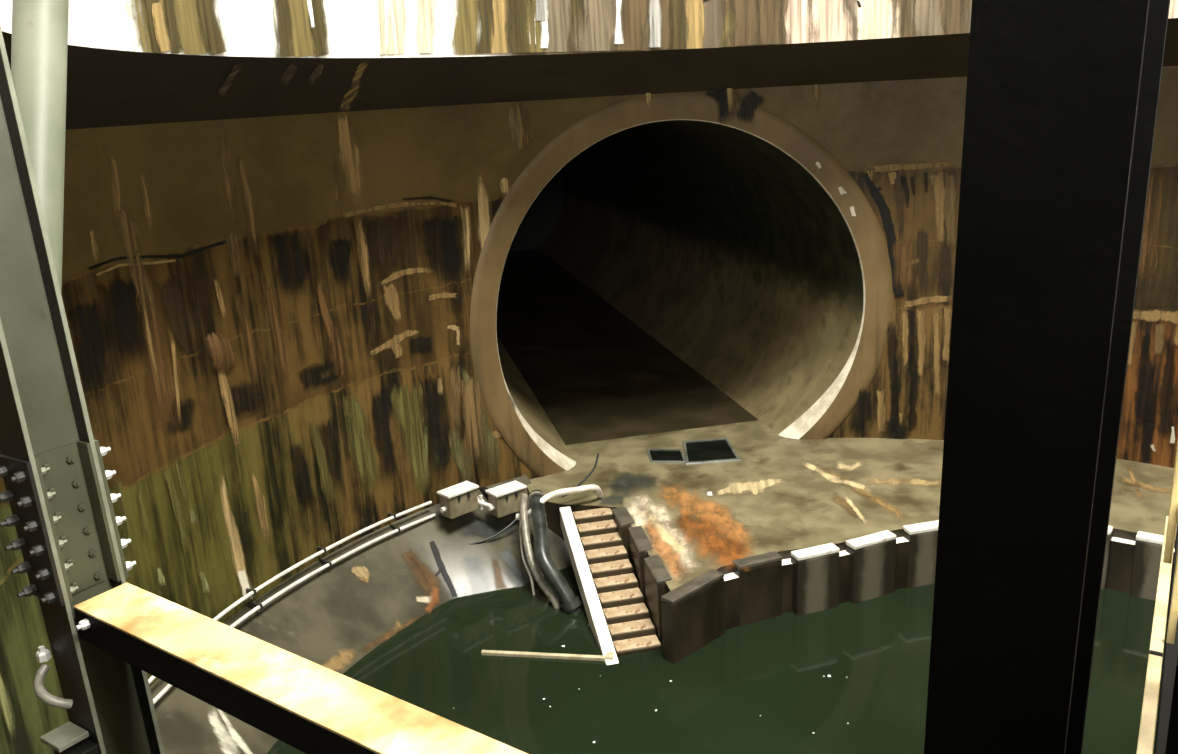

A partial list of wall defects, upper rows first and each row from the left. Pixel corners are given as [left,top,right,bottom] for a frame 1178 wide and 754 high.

leakage [335,63,367,205]
leakage [72,156,194,390]
leakage [330,216,400,289]
leakage [425,179,491,272]
leakage [168,398,192,430]
leakage [221,384,259,424]
leakage [290,364,501,503]
leakage [114,482,148,539]
leakage [164,462,195,549]
leakage [251,474,268,535]
rust [628,488,748,575]